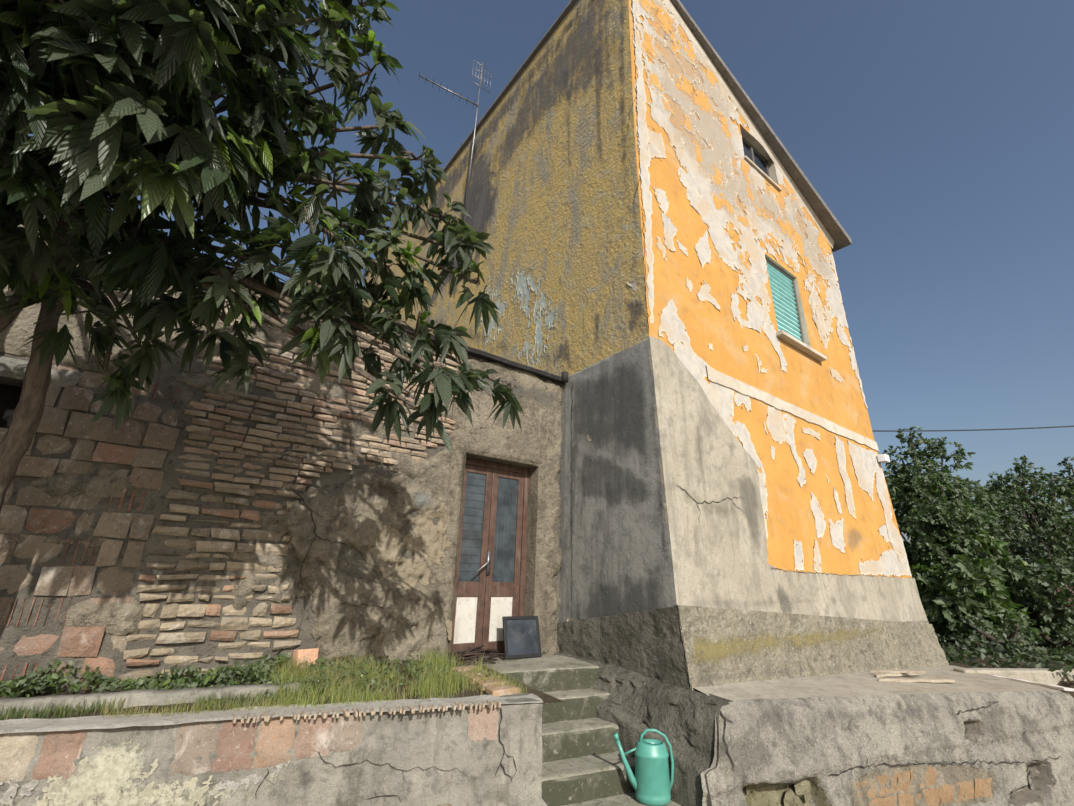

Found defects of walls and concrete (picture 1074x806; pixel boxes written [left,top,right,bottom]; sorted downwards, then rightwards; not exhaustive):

damp [419,0,609,262]
peeling [481,264,557,368]
damp [628,301,642,330]
peeling [627,0,912,577]
damp [562,368,645,453]
crack [679,486,745,523]
crack [290,487,347,634]
damp [49,746,231,806]
crack [495,708,517,781]
spalling [742,777,832,806]
crack [828,755,1062,783]
spalling [1008,760,1057,806]